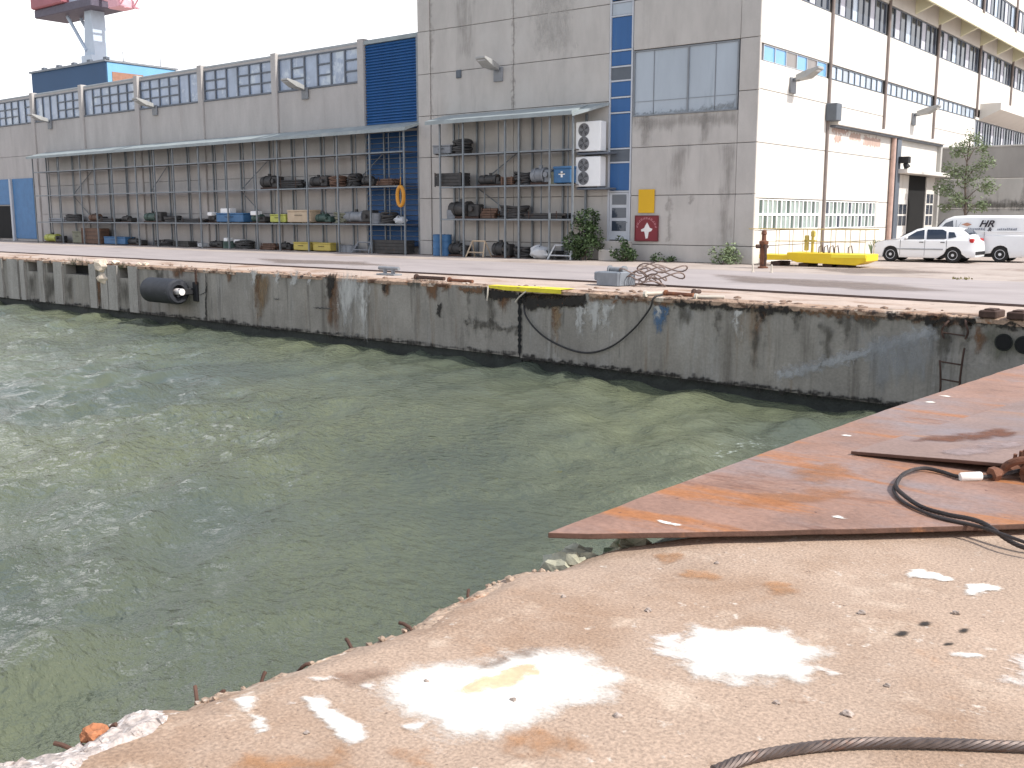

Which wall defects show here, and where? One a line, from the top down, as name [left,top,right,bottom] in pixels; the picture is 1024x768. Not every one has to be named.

corrosion [255,275,267,309]
damp [0,275,935,407]
spalling [187,568,559,711]